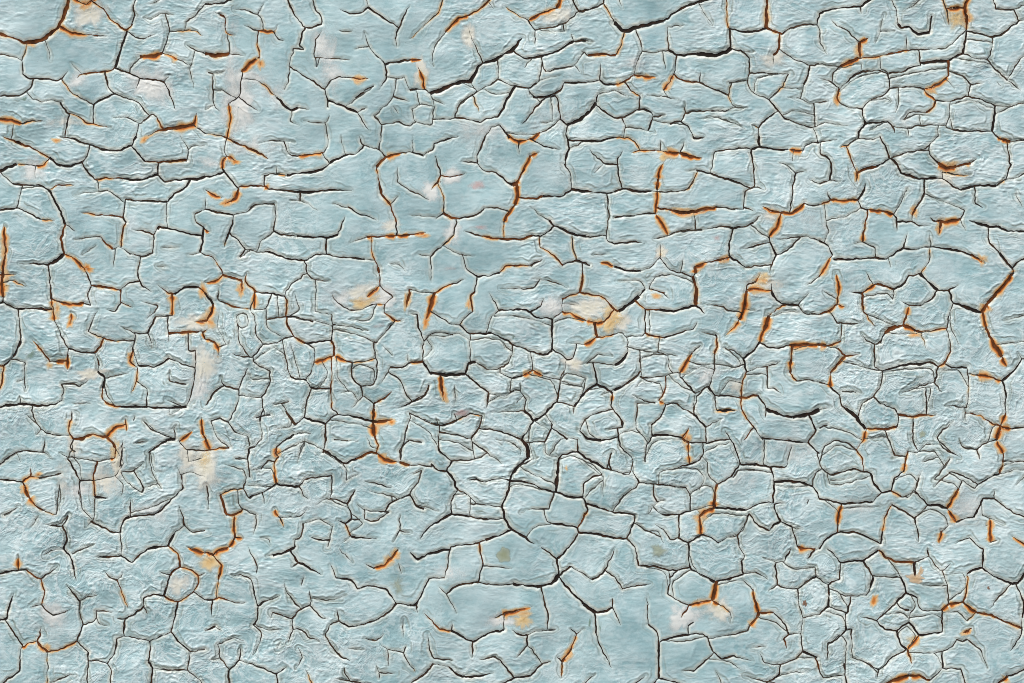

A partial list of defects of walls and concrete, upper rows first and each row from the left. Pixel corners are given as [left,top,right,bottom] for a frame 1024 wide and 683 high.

crack [356,0,1024,239]
corrosion [502,134,540,223]
corrosion [653,147,716,235]
crack [0,0,458,683]
corrosion [423,294,437,330]
corrosion [727,273,771,335]
corrosion [757,317,773,342]
corrosion [979,270,1015,367]
crack [358,150,1024,683]
corrosion [992,415,1011,454]
corrosion [188,517,243,579]
corrosion [502,607,532,629]